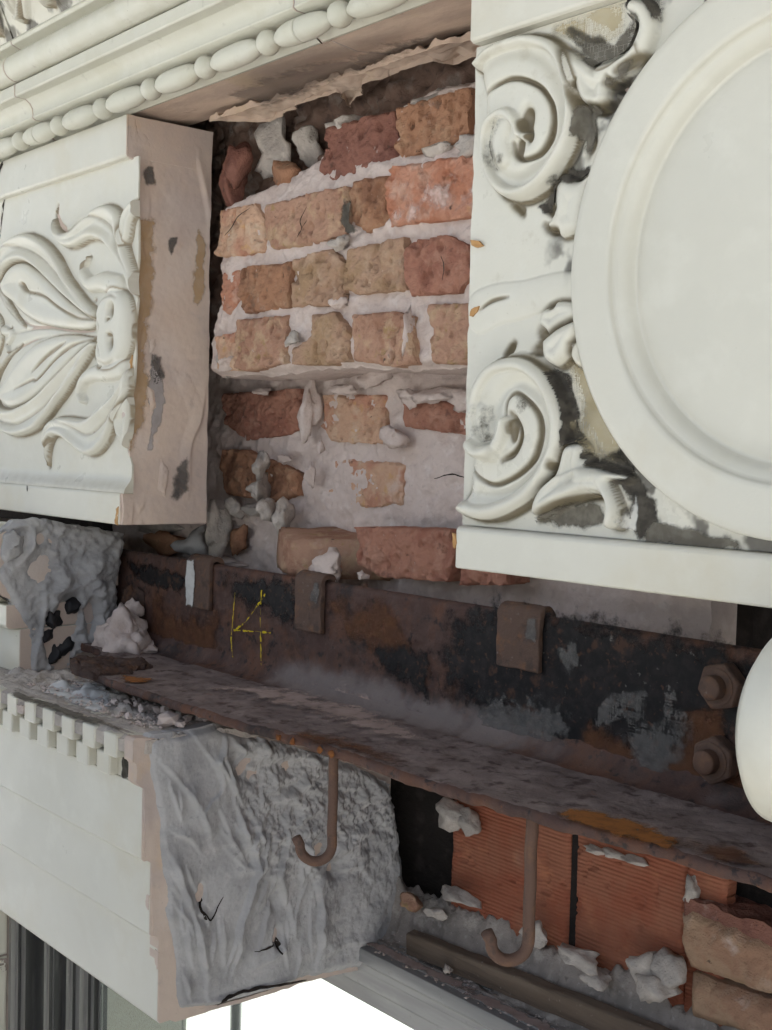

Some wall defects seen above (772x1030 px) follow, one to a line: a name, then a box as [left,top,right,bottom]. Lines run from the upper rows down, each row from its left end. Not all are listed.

water stain [556,8,624,42]
spalling [209,31,480,122]
spalling [218,141,253,207]
water stain [574,365,619,457]
spalling [0,506,119,530]
water stain [620,504,638,530]
rust [276,732,395,761]
rust [659,709,724,777]
rust [724,773,744,789]
spalling [390,778,454,898]
rust [560,809,757,864]
spalling [736,882,772,908]